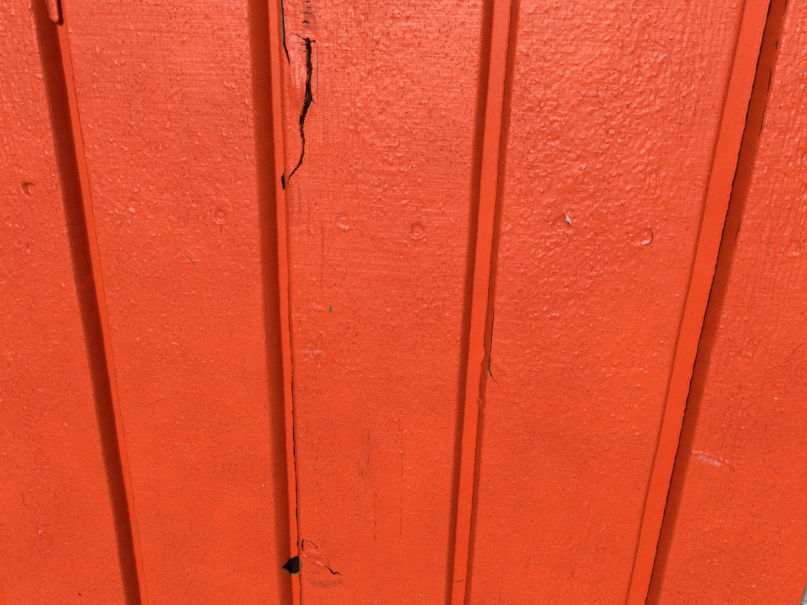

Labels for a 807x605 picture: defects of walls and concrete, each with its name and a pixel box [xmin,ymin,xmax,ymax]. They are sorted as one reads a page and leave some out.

crack [280,0,318,182]
crack [488,307,500,388]